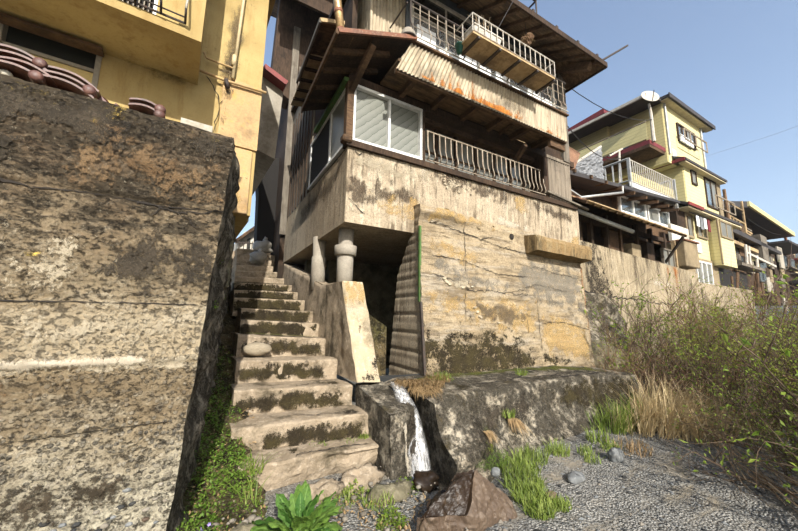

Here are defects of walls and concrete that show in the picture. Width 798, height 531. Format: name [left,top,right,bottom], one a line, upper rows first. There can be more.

corrosion [424,68,523,121]
damp [346,156,571,231]
crack [0,298,197,306]
damp [426,242,590,360]
crack [0,421,167,445]